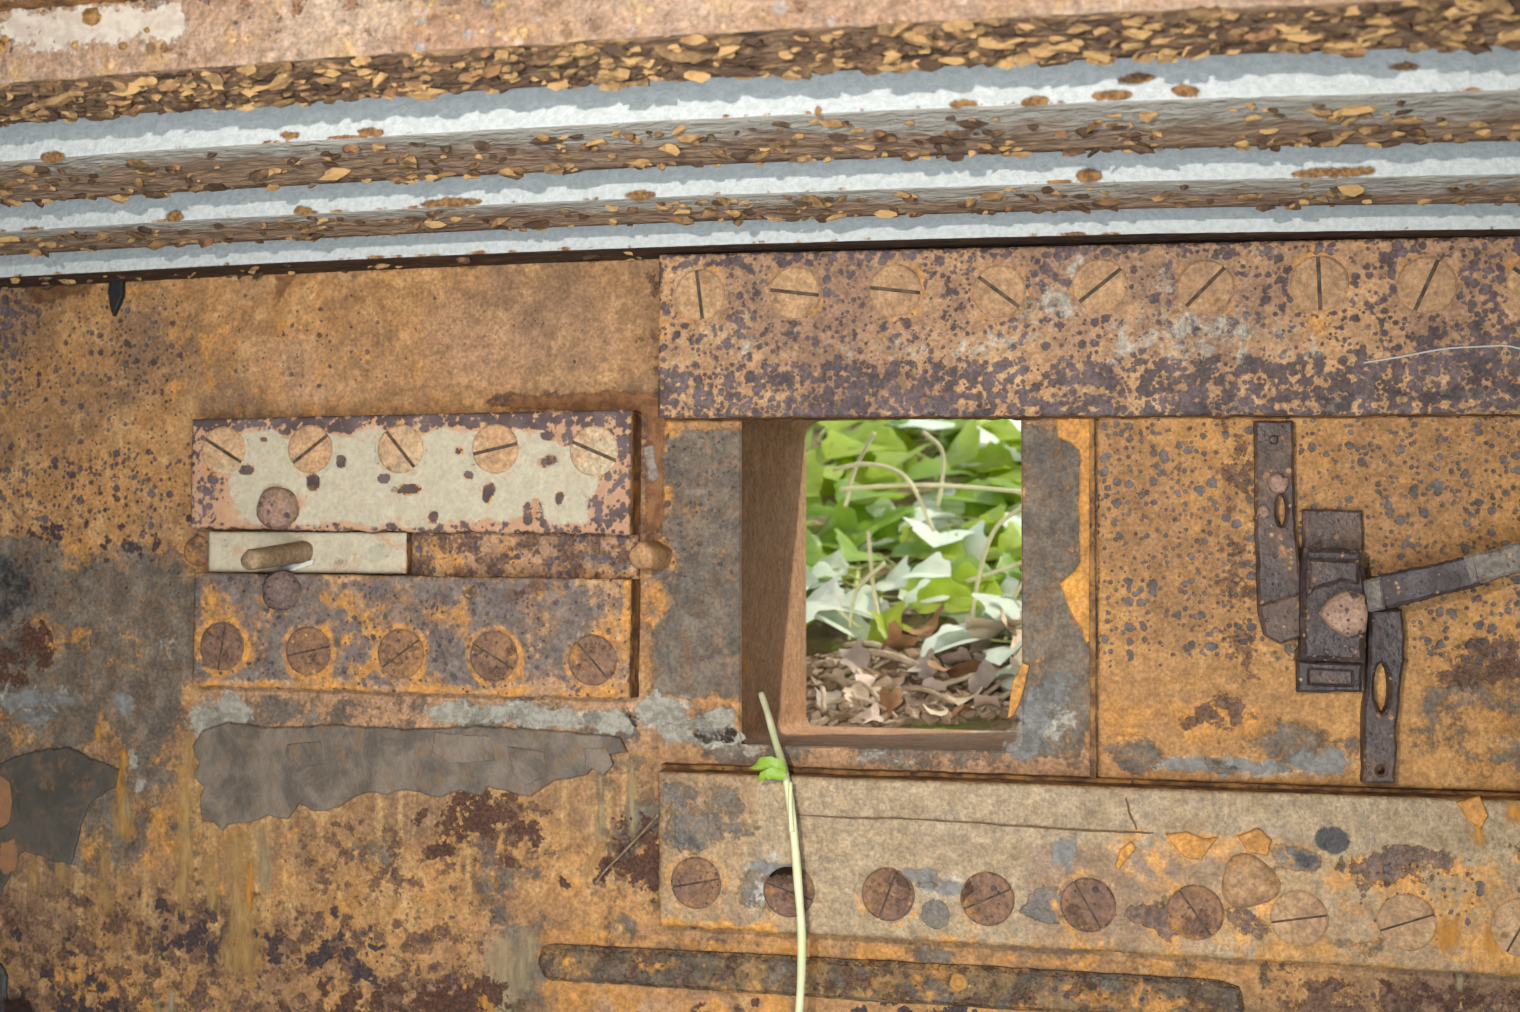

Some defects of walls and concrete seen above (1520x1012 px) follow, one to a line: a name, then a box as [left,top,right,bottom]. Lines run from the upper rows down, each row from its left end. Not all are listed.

rust [509,390,666,534]
rust [84,508,161,569]
rust [0,618,57,688]
peeling [192,722,628,831]
peeling [0,747,120,898]
rust [411,789,544,868]
rust [592,811,659,903]
peeling [0,963,33,1012]
rust [154,896,236,971]
rust [252,906,528,1012]
rust [841,1002,977,1012]
rust [1376,973,1485,1012]